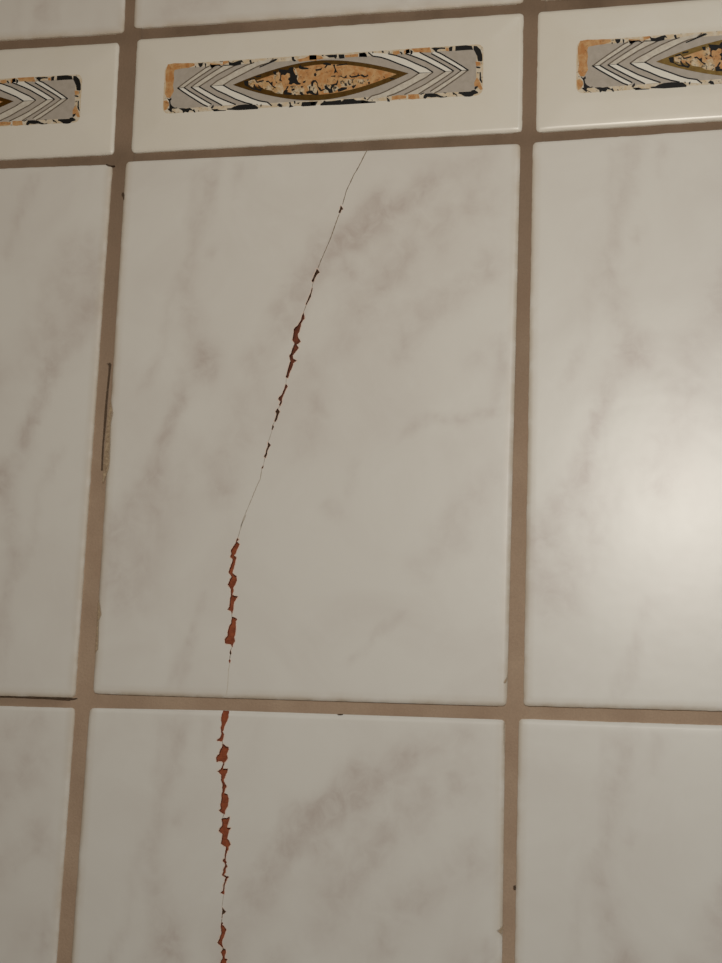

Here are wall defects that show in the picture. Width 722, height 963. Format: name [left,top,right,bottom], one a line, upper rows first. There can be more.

crack [215,149,368,963]